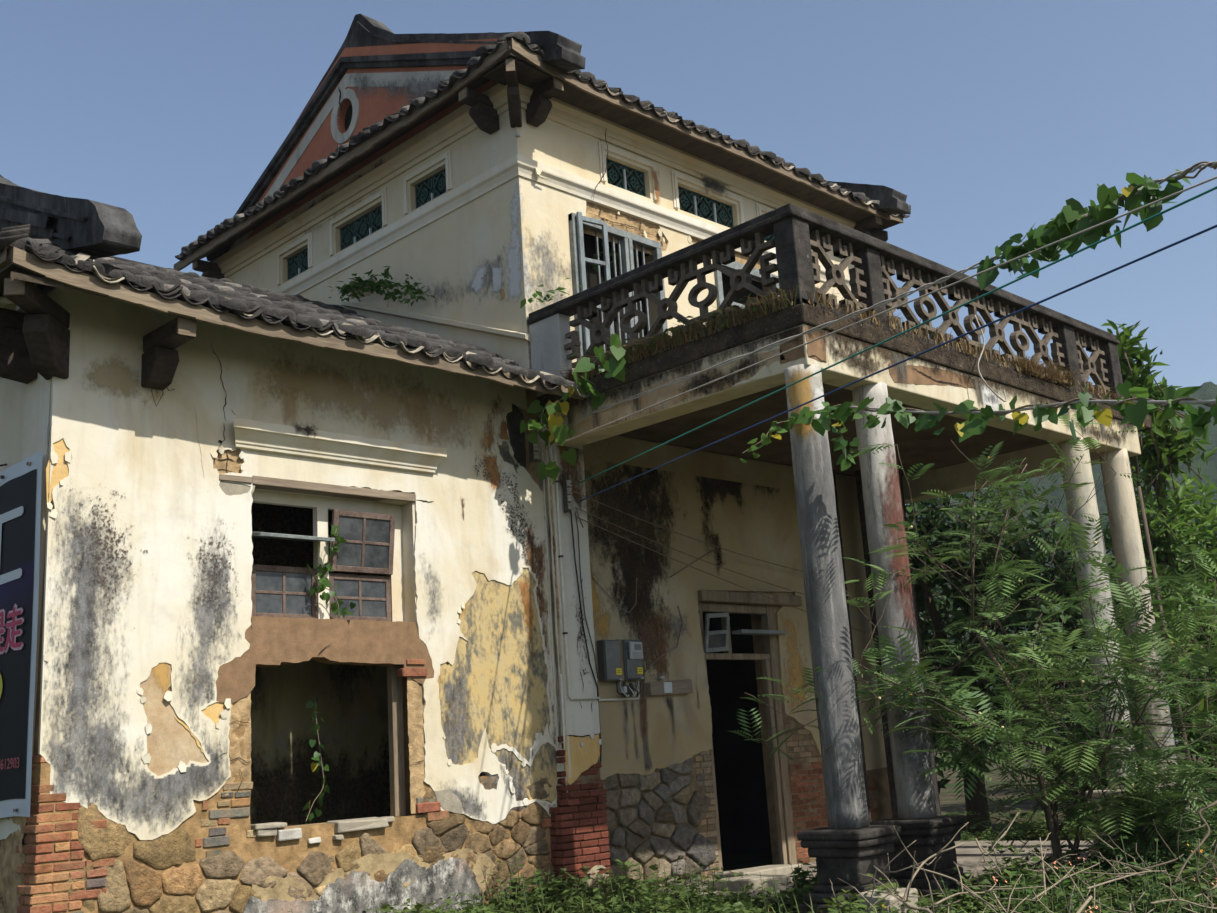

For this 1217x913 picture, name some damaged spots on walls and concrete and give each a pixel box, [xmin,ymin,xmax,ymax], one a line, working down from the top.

peeling [471,184,532,300]
peeling [45,438,72,519]
leakage [46,489,224,823]
leakage [181,523,238,720]
crack [194,340,236,472]
spalling [210,445,252,484]
leakage [474,445,686,743]
peeling [566,325,827,440]
leakage [697,477,742,570]
leakage [567,326,1135,445]
rust [880,447,917,630]
spalling [0,568,720,913]